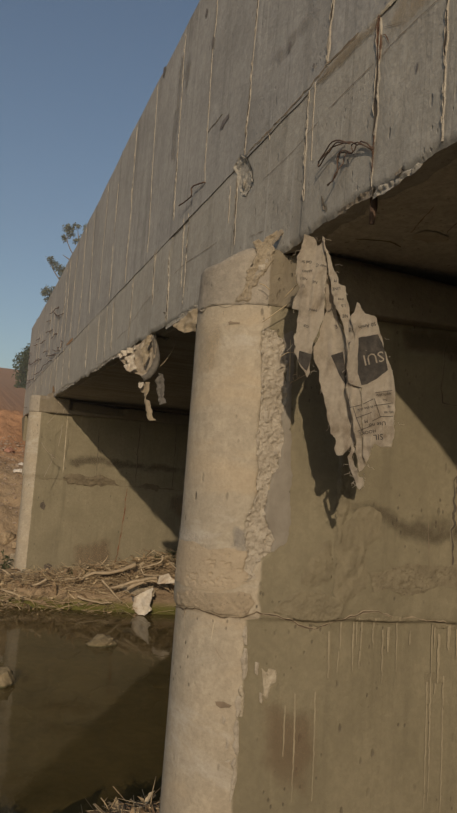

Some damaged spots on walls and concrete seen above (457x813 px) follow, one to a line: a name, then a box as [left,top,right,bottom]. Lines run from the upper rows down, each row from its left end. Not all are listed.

crack [24,0,449,405]
spalling [235,229,284,302]
peeling [244,328,296,576]
crack [449,464,457,566]
peeling [215,626,277,803]
water stain [282,693,296,803]
water stain [352,616,408,683]
water stain [423,623,457,813]